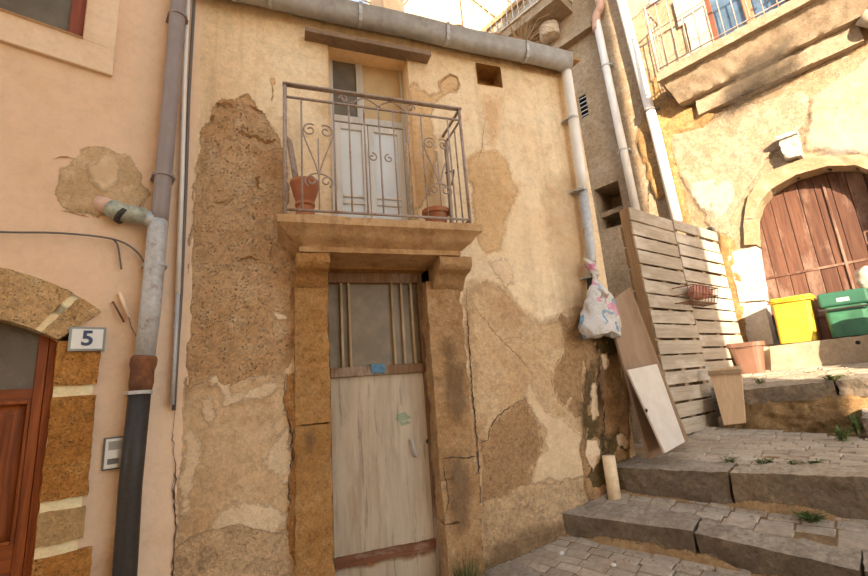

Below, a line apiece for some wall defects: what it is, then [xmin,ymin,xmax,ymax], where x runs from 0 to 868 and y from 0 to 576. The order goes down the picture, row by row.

peeling [55,147,150,218]
peeling [184,93,304,435]
peeling [635,76,811,342]
spalling [287,451,297,566]
crack [442,289,532,516]
peeling [479,399,543,502]
spalling [552,314,633,501]